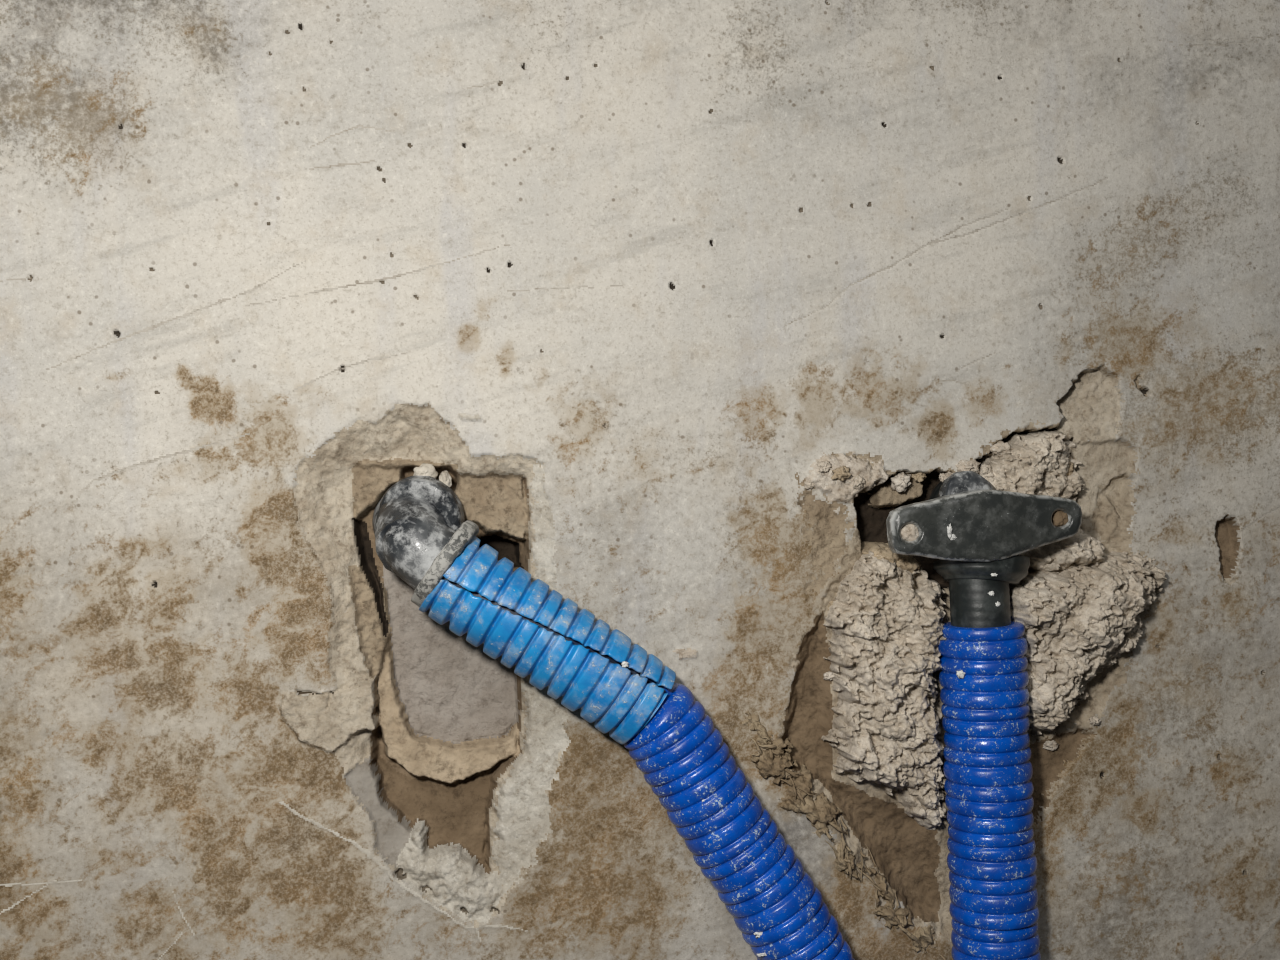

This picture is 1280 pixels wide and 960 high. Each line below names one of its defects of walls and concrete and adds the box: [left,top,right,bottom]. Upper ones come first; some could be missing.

crack [785,177,1108,326]
spalling [970,366,1149,558]
spalling [1215,514,1241,586]
leakage [0,627,81,858]
spalling [281,403,572,928]
spalling [750,451,956,953]
spalling [1027,603,1156,824]